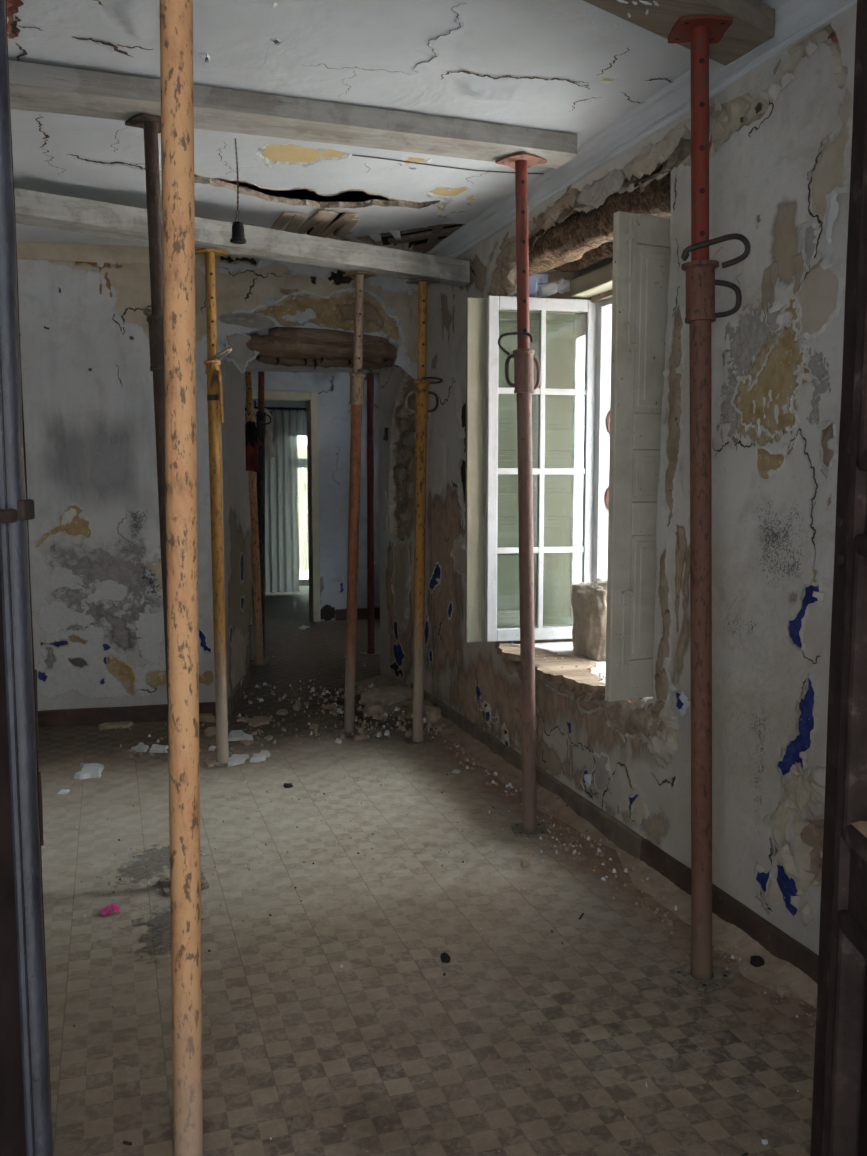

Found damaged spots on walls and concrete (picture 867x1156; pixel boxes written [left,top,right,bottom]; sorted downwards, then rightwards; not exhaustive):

crack [72,37,153,58]
crack [303,3,673,111]
peeling [38,258,152,340]
peeling [195,254,418,366]
flaking render [487,118,691,298]
peeling [709,23,854,482]
crack [797,137,827,291]
flaking render [428,401,466,593]
damp [50,509,160,650]
peeling [786,567,825,653]
crack [515,708,675,826]
flaking render [754,673,826,914]